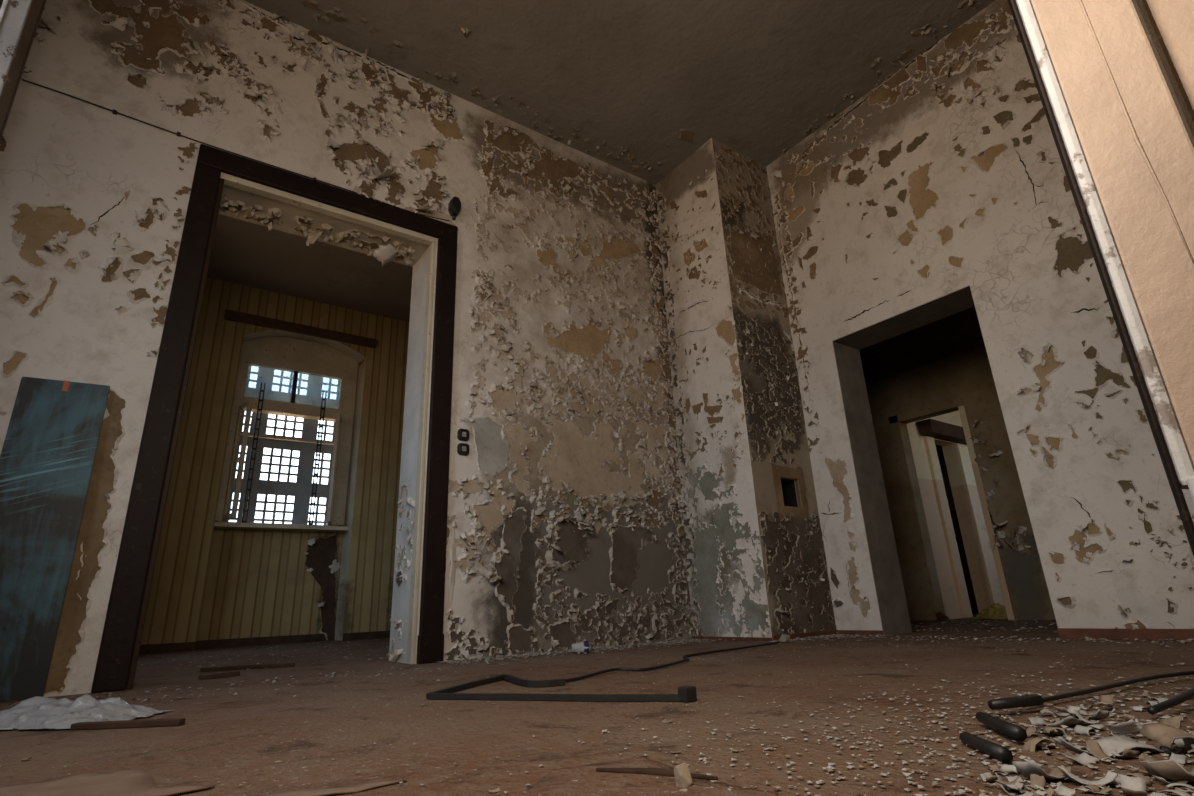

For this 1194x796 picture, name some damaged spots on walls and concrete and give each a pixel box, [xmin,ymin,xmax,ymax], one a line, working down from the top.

peeling [88,0,464,231]
peeling [1,186,191,328]
crack [90,192,131,237]
peeling [219,197,422,266]
crack [1015,149,1045,211]
peeling [1047,175,1094,282]
peeling [0,350,29,378]
peeling [444,0,1056,661]
peeling [1016,299,1149,470]
peeling [396,483,415,587]
peeling [1048,479,1194,614]
peeling [1114,605,1150,630]